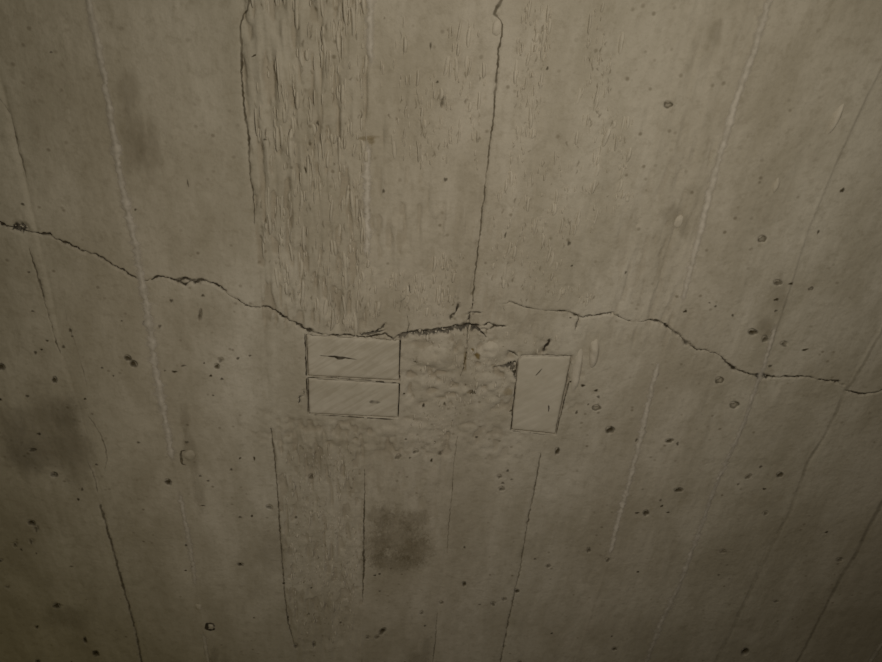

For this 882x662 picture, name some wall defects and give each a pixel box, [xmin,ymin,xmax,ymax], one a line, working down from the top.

crack [0,186,505,339]
crack [553,310,882,394]